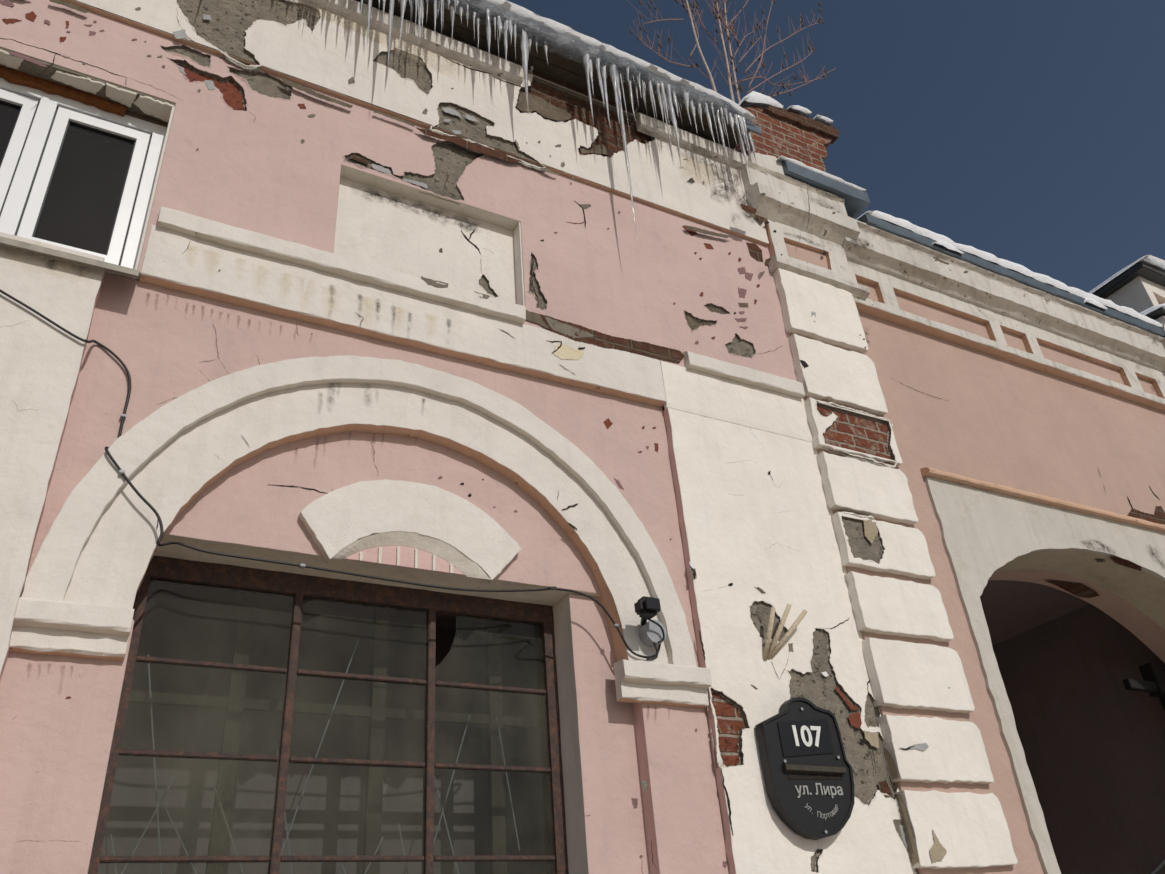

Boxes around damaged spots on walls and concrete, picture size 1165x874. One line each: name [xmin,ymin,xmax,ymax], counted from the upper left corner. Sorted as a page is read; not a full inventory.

peeling [0,0,50,25]
flaking render [132,0,322,121]
flaking render [342,46,565,205]
flaking render [514,66,655,158]
flaking render [526,252,684,374]
peeling [673,242,782,359]
flaking render [814,399,897,469]
flaking render [841,511,885,564]
flaking render [1127,486,1165,525]
flaking render [749,587,794,652]
flaking render [695,687,751,769]
flaking render [771,627,947,874]